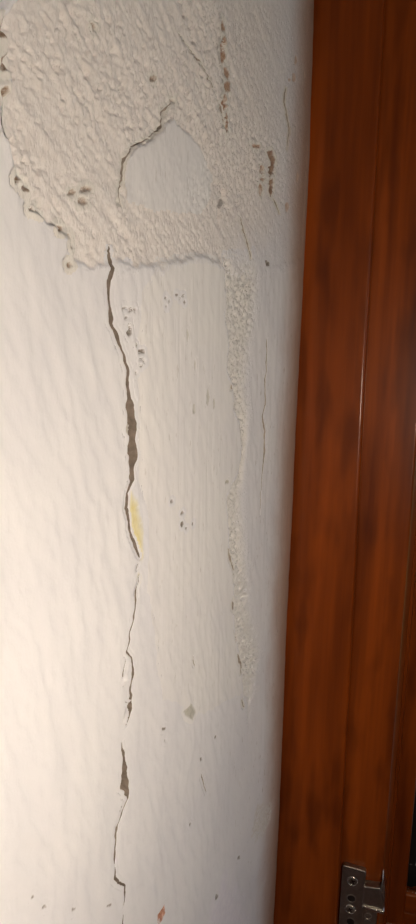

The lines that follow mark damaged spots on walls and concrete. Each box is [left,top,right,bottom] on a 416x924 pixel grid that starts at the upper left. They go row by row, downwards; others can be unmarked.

crack [103,244,142,924]
spalling [0,0,314,736]
crack [259,338,269,516]